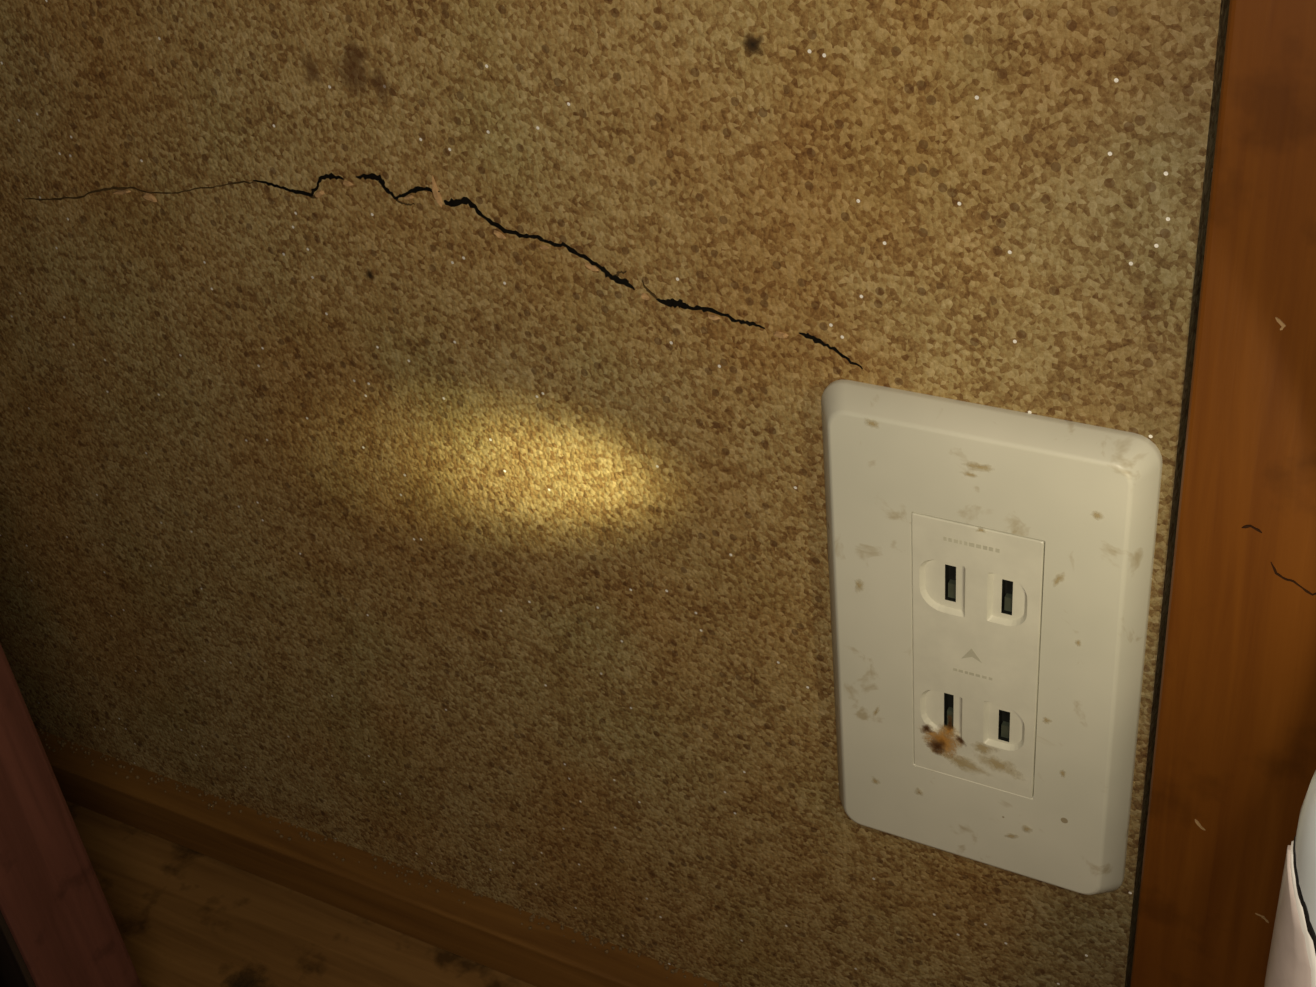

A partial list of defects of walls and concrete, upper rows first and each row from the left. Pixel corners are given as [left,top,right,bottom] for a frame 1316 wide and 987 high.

crack [26,173,863,369]